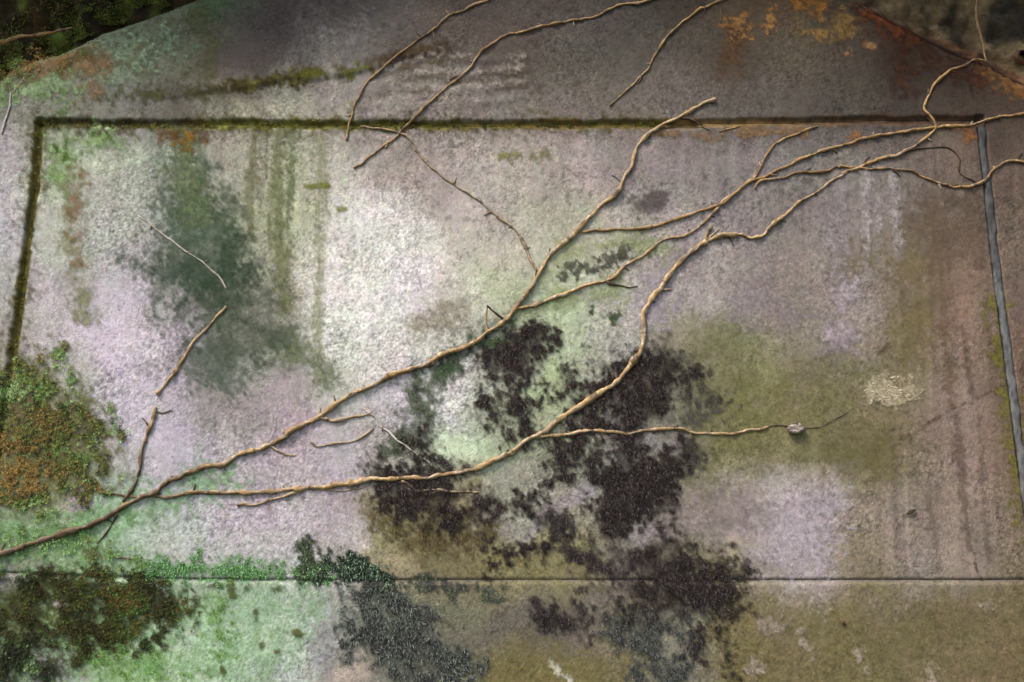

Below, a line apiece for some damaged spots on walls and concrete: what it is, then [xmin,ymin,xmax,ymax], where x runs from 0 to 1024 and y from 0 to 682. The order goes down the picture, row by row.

rust [718,5,777,81]
rust [790,0,1024,100]
water stain [157,121,224,228]
water stain [245,127,297,313]
water stain [260,327,335,388]
water stain [293,270,853,682]